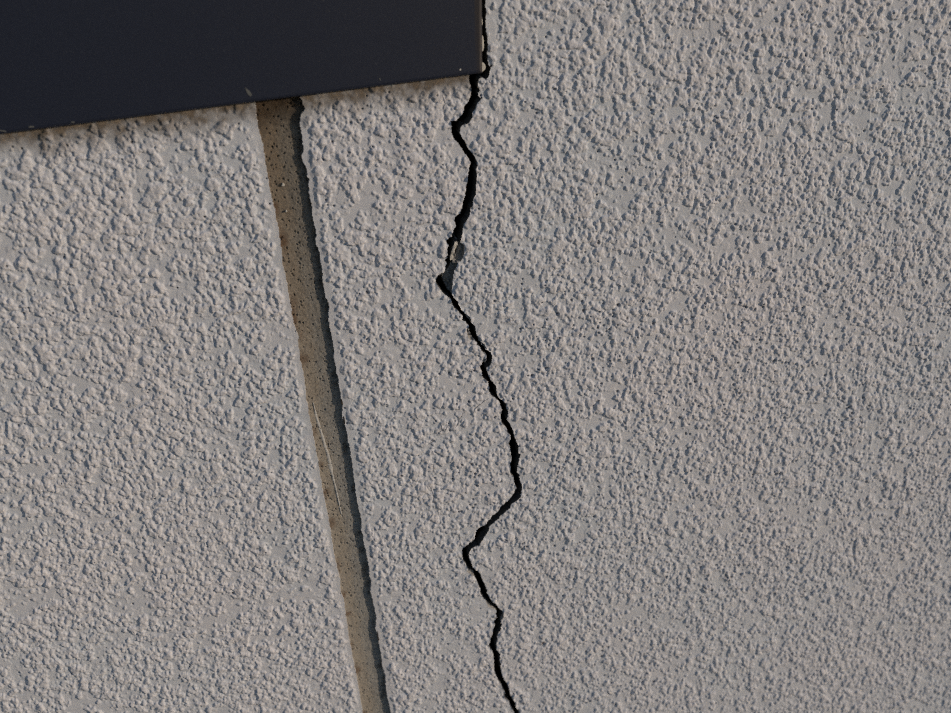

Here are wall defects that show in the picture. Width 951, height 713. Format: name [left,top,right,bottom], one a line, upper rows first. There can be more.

crack [395,0,522,713]